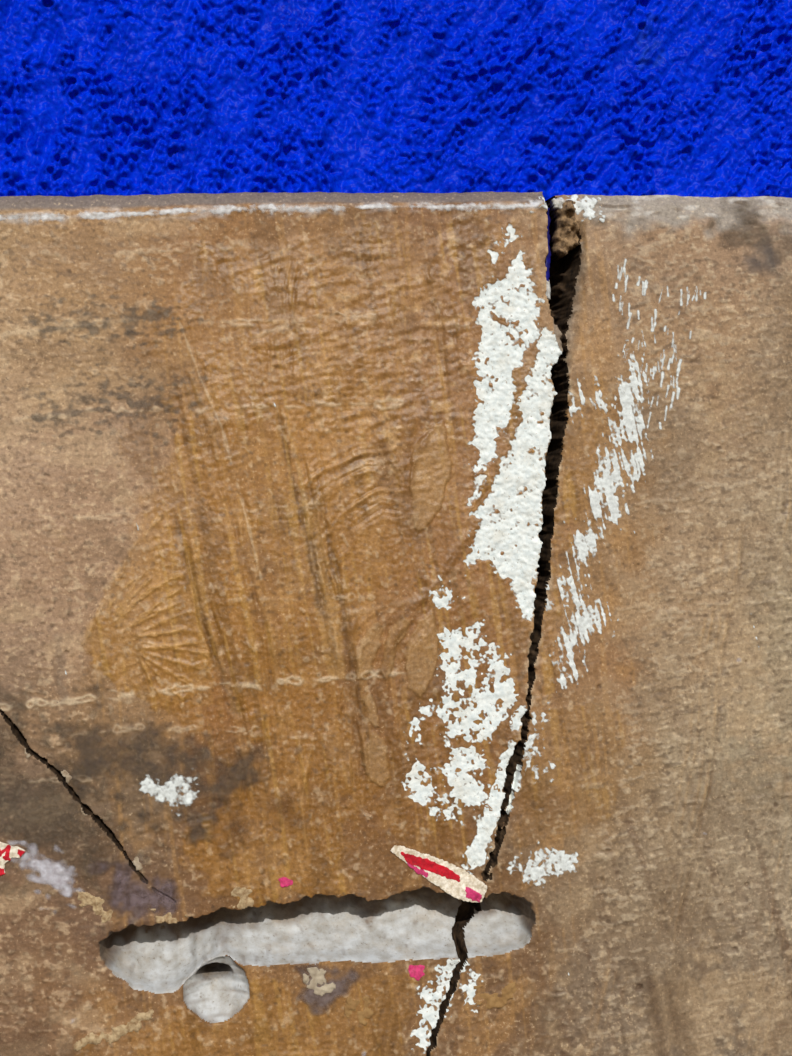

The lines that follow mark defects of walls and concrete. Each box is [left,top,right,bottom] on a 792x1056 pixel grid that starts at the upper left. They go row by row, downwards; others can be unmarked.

peeling [463,224,706,689]
peeling [429,575,465,610]
crack [426,196,582,1056]
peeling [402,620,556,875]
crack [0,709,157,891]
spalling [149,908,187,924]
spalling [231,887,254,910]
spalling [303,967,336,996]
peeling [410,958,517,1053]